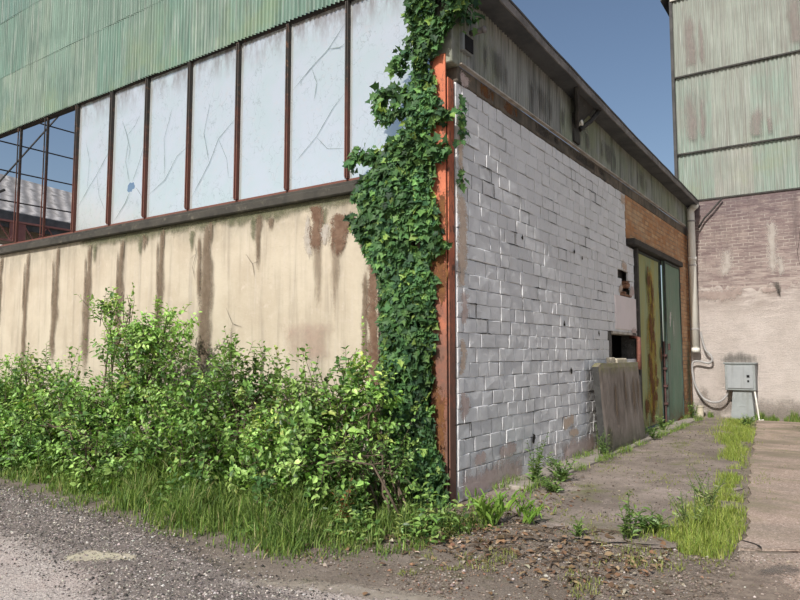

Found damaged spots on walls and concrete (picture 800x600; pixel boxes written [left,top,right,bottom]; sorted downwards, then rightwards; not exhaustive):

leakage [570,149,603,175]
leakage [21,254,29,361]
leakage [49,248,59,356]
leakage [81,194,353,372]
peeling [455,193,470,324]
peeling [459,339,468,375]
peeling [460,392,471,421]
spalling [619,260,634,298]
rust [646,267,662,423]